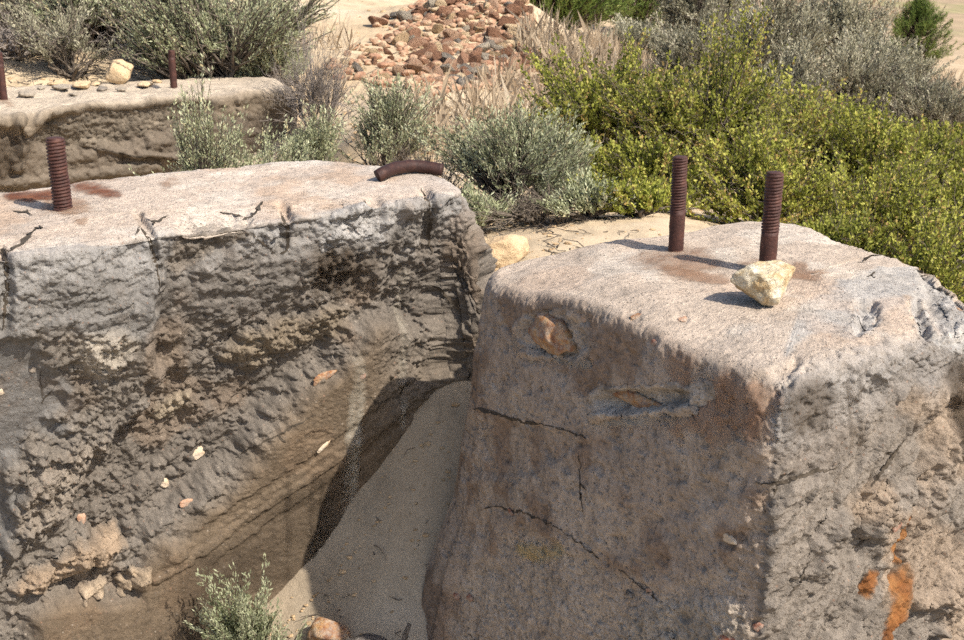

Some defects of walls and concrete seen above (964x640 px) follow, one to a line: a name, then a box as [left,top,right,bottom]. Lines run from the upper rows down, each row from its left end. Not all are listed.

corrosion [76,183,120,196]
crack [136,215,168,293]
corrosion [651,251,726,283]
spalling [578,378,721,425]
crack [474,407,585,512]
crack [480,506,599,559]
crack [619,570,662,602]
corrosion [859,518,913,640]